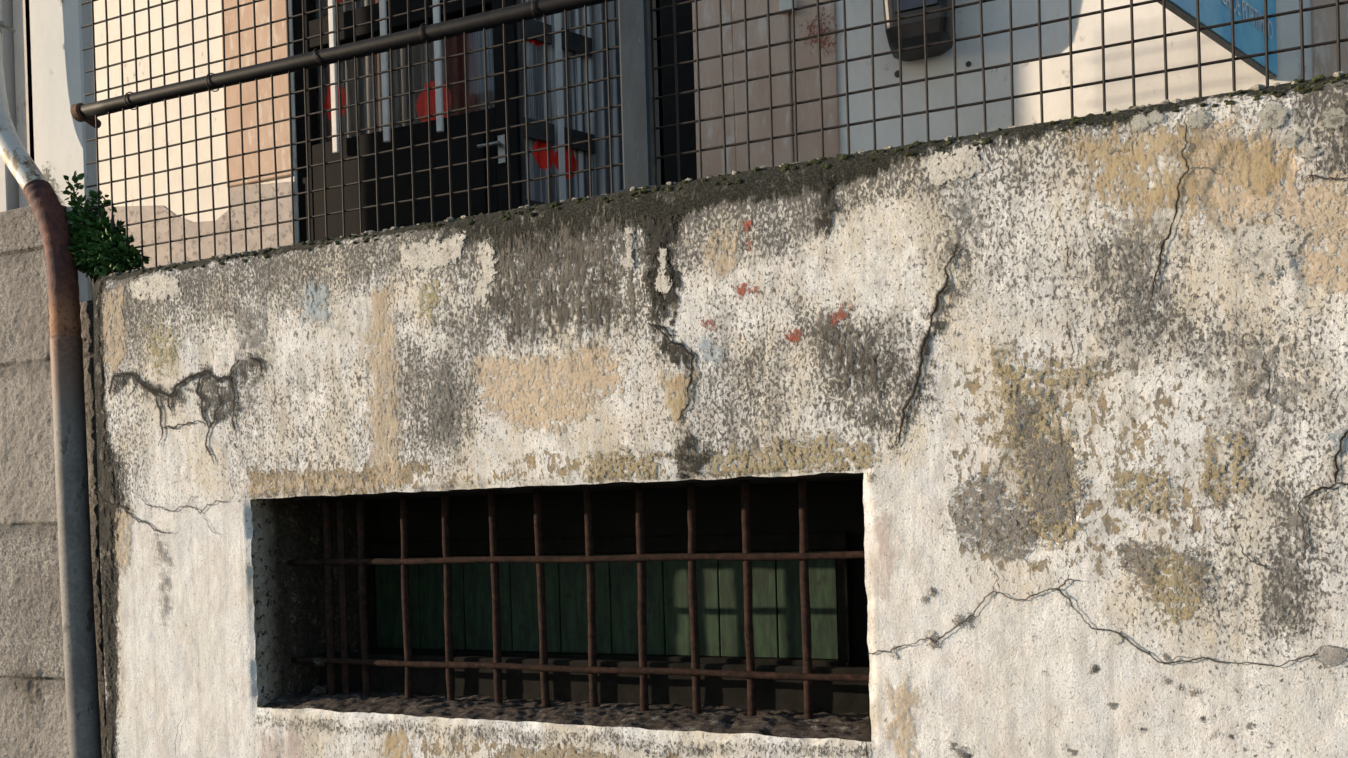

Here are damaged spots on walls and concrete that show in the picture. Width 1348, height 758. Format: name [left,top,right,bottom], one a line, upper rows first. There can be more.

leakage [1292,81,1348,190]
crack [94,354,267,539]
peeling [469,335,629,436]
leakage [469,199,689,365]
crack [648,322,698,425]
leakage [810,171,841,270]
crack [879,240,972,456]
leakage [930,168,1000,296]
crack [1149,122,1222,309]
spalling [1178,117,1348,302]
crack [1297,430,1348,563]
crack [868,568,1318,667]